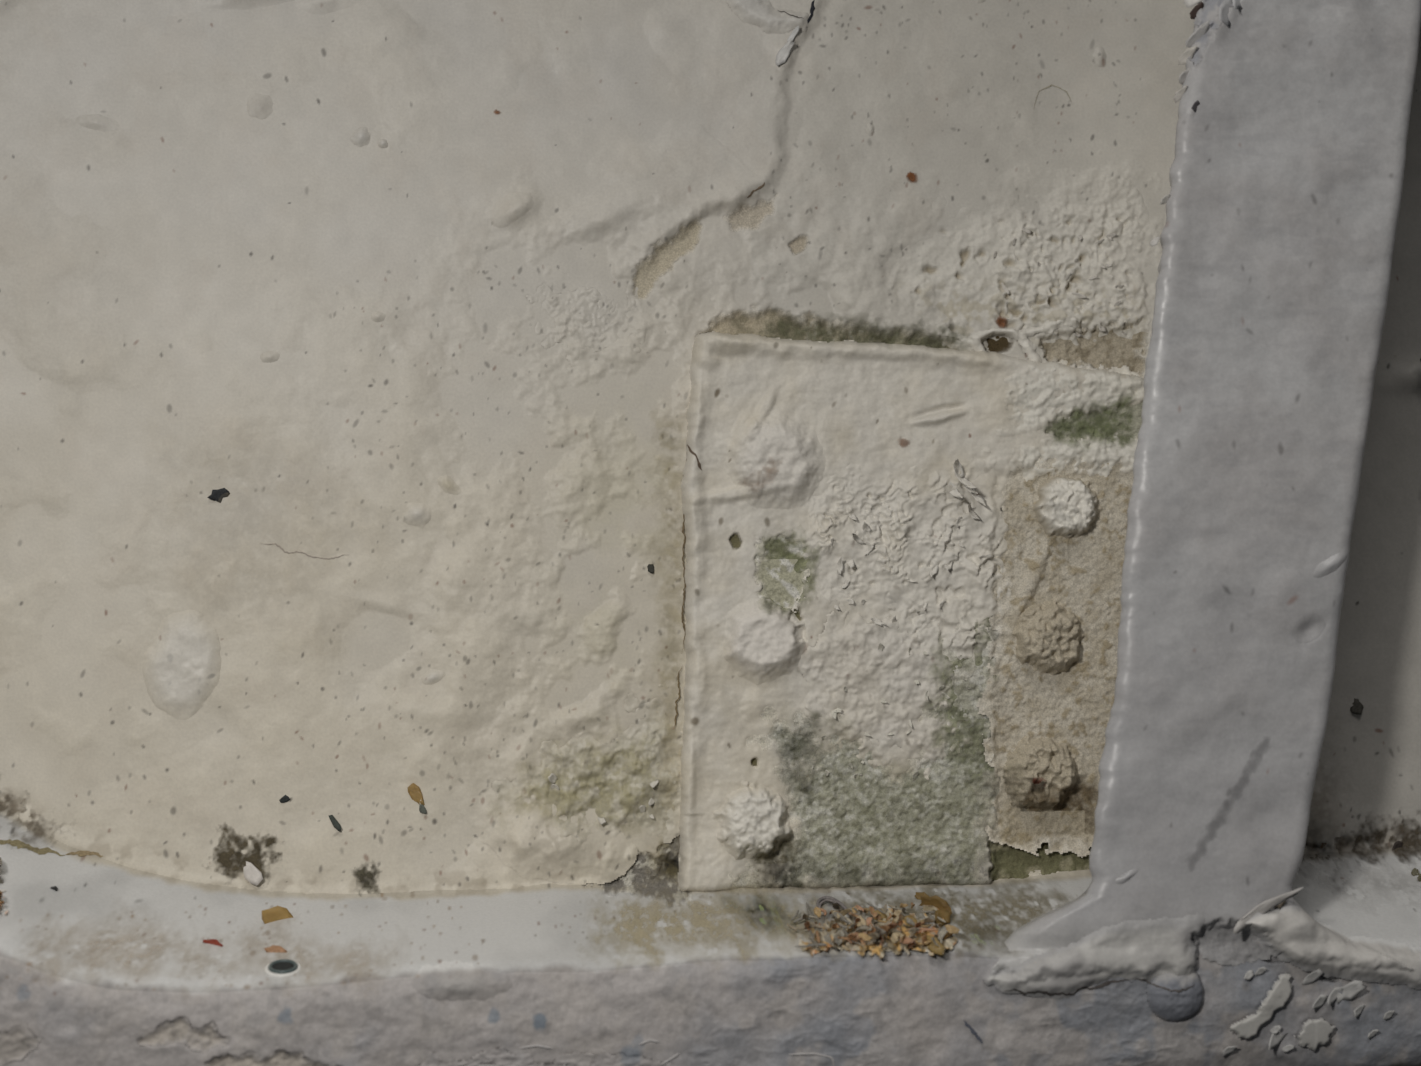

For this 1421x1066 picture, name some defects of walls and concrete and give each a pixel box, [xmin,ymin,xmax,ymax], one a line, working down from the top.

peeling [1172,0,1243,112]
spalling [698,172,1170,889]
spalling [136,1018,338,1066]
peeling [982,887,1421,1056]